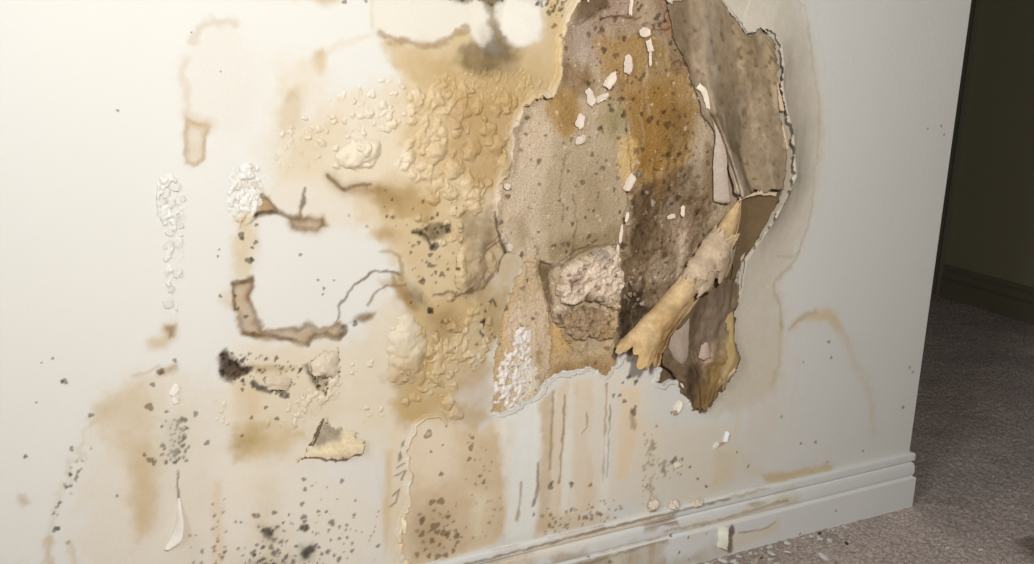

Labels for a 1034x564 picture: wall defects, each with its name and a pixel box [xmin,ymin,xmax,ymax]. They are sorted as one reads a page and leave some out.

water stain [252,0,349,12]
water stain [314,0,572,182]
peeling [164,469,184,551]
water stain [37,43,524,564]
peeling [310,347,341,379]
peeling [296,417,366,462]
flaking render [490,0,740,417]
water stain [461,0,880,564]